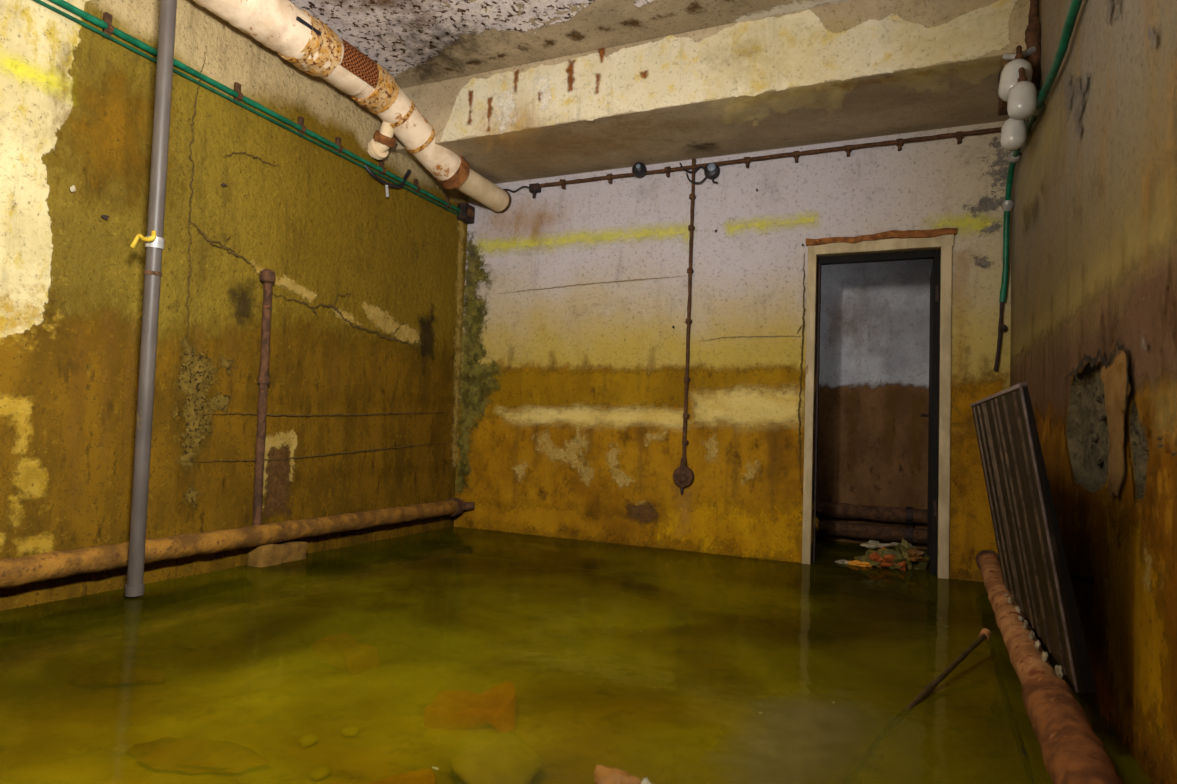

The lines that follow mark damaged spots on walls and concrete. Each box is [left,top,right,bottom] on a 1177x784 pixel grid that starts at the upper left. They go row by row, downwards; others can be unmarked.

peeling [289,0,596,77]
corrosion [566,60,575,91]
corrosion [596,48,605,93]
peeling [0,0,90,338]
crack [186,47,428,355]
leakage [0,567,128,611]
leakage [0,298,141,559]
leakage [143,548,248,584]
leakage [146,220,929,562]
peeling [533,426,594,486]
leakage [949,234,1177,784]
spalling [1066,362,1110,493]